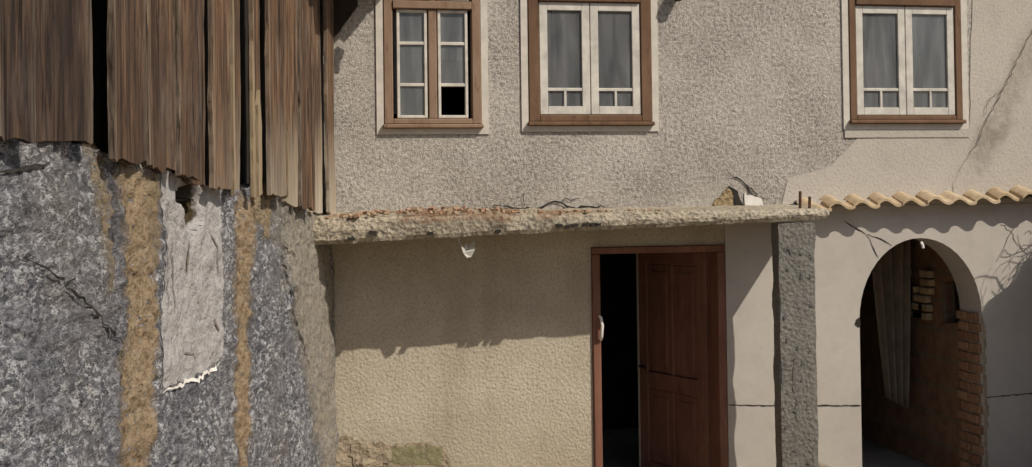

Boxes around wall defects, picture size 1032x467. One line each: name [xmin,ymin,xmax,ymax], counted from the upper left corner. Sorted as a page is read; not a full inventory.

crack [952,33,1032,193]
crack [11,252,130,381]
peeling [159,169,225,392]
crack [845,221,892,257]